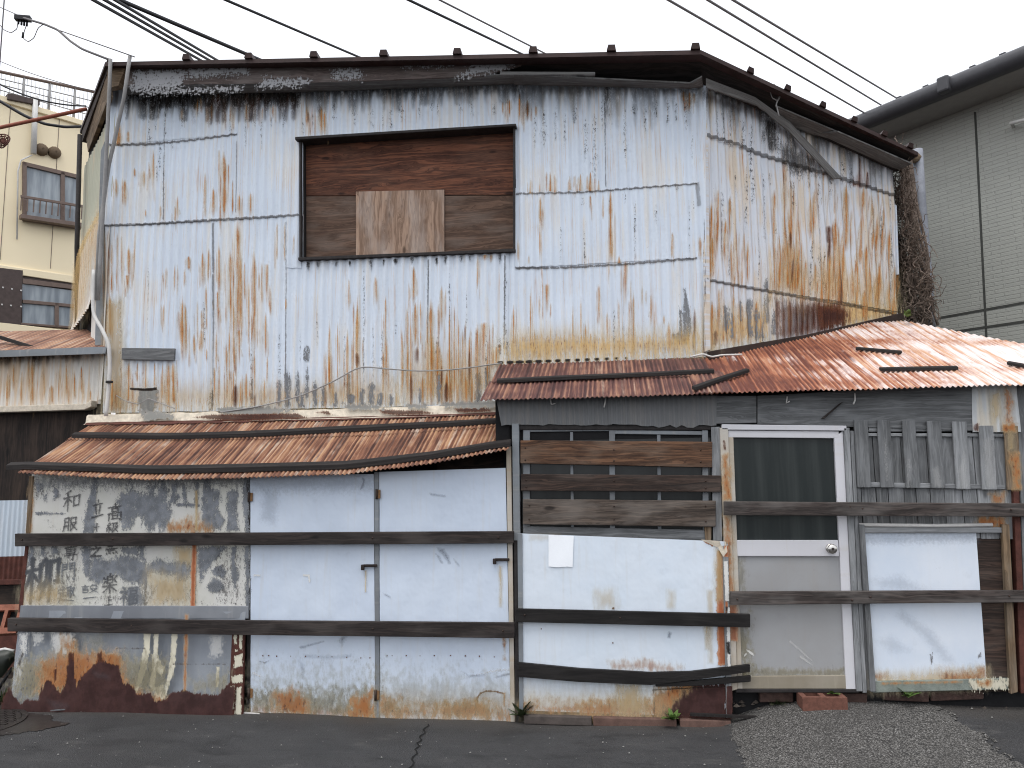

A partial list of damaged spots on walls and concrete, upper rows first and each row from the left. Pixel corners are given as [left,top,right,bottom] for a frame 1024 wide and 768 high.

peeling [128,68,313,97]
water stain [125,84,517,195]
rust [401,159,896,404]
rust [163,228,271,407]
peeling [27,473,250,533]
peeling [80,545,252,611]
rust [704,517,738,613]
peeling [12,632,77,685]
peeling [135,634,178,700]
peeling [215,635,260,714]
rust [255,687,511,722]
rust [717,627,738,666]